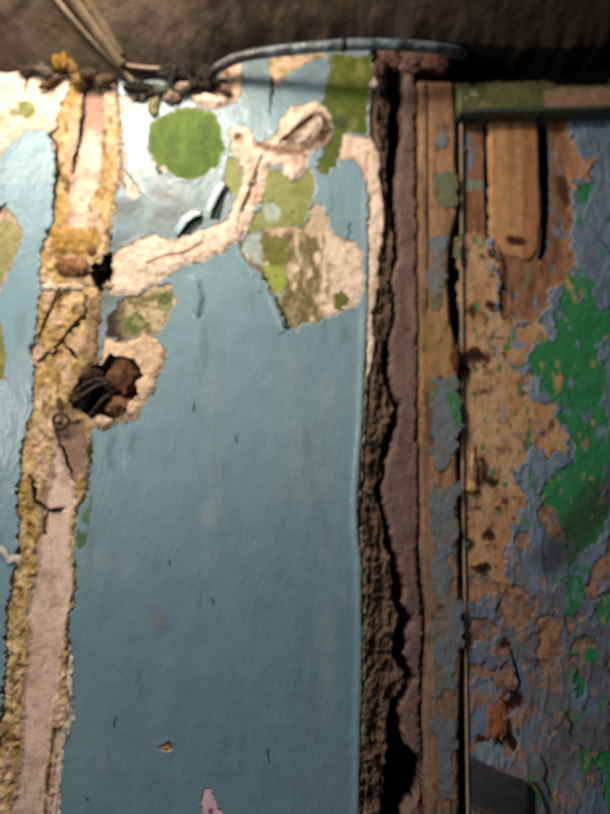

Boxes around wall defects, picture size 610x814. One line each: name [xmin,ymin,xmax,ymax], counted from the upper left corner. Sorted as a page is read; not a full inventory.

peeling [431,171,459,208]
peeling [576,183,594,204]
crack [35,292,88,363]
flaking render [0,51,451,814]
peeling [424,232,610,710]
peeling [428,713,458,800]
spalling [506,721,520,751]
peeling [595,751,610,810]